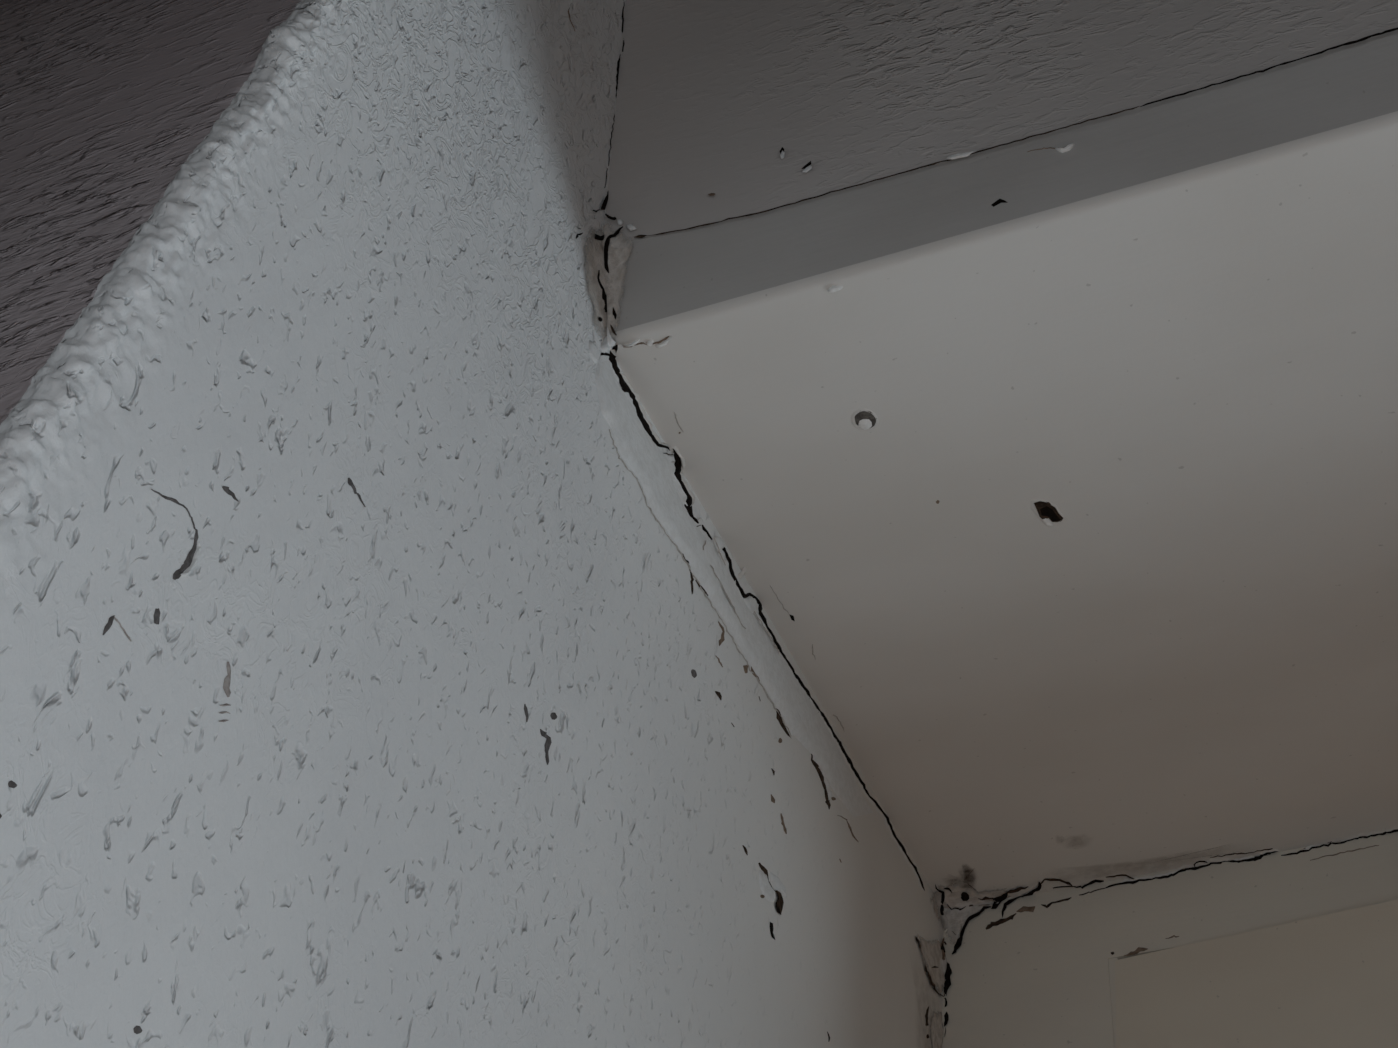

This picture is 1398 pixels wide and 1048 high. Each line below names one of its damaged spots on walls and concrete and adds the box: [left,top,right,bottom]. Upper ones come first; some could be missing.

crack [608,3,625,166]
crack [647,28,1398,236]
flaking render [576,168,672,364]
crack [600,345,925,891]
crack [1041,826,1398,895]
crack [925,998,949,1048]